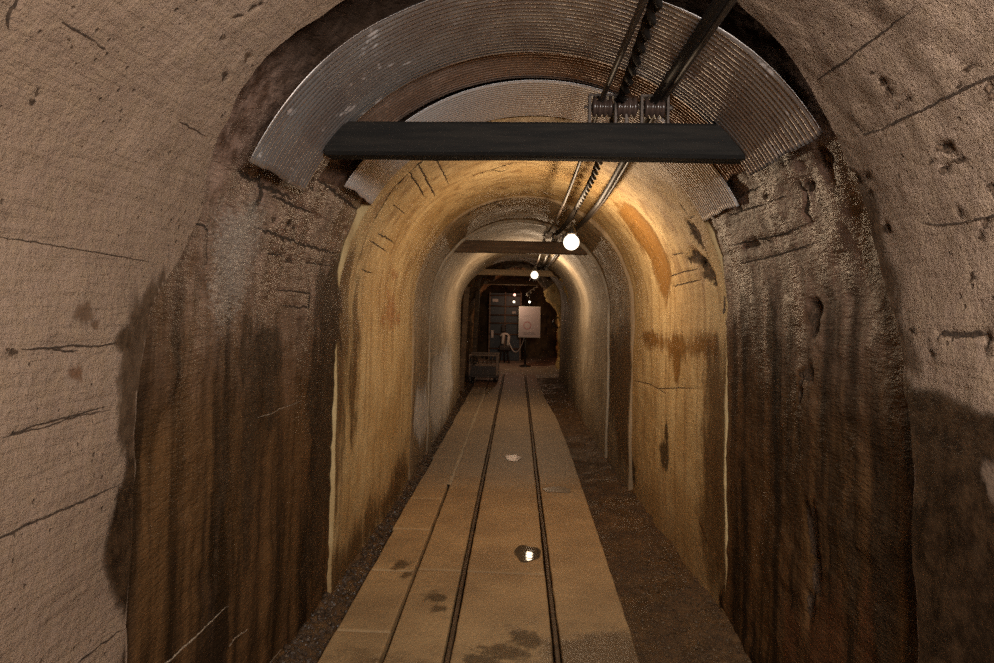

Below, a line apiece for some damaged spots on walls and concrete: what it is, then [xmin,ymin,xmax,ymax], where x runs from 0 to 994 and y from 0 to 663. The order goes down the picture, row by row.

crack [817,7,916,80]
crack [853,75,994,135]
crack [2,237,150,262]
crack [21,342,115,352]
crack [937,330,991,350]
crack [3,405,108,438]
leakage [105,273,165,613]
leakage [609,317,635,484]
leakage [644,332,726,595]
leakage [858,183,994,663]
crack [0,484,120,539]
leakage [465,630,540,663]